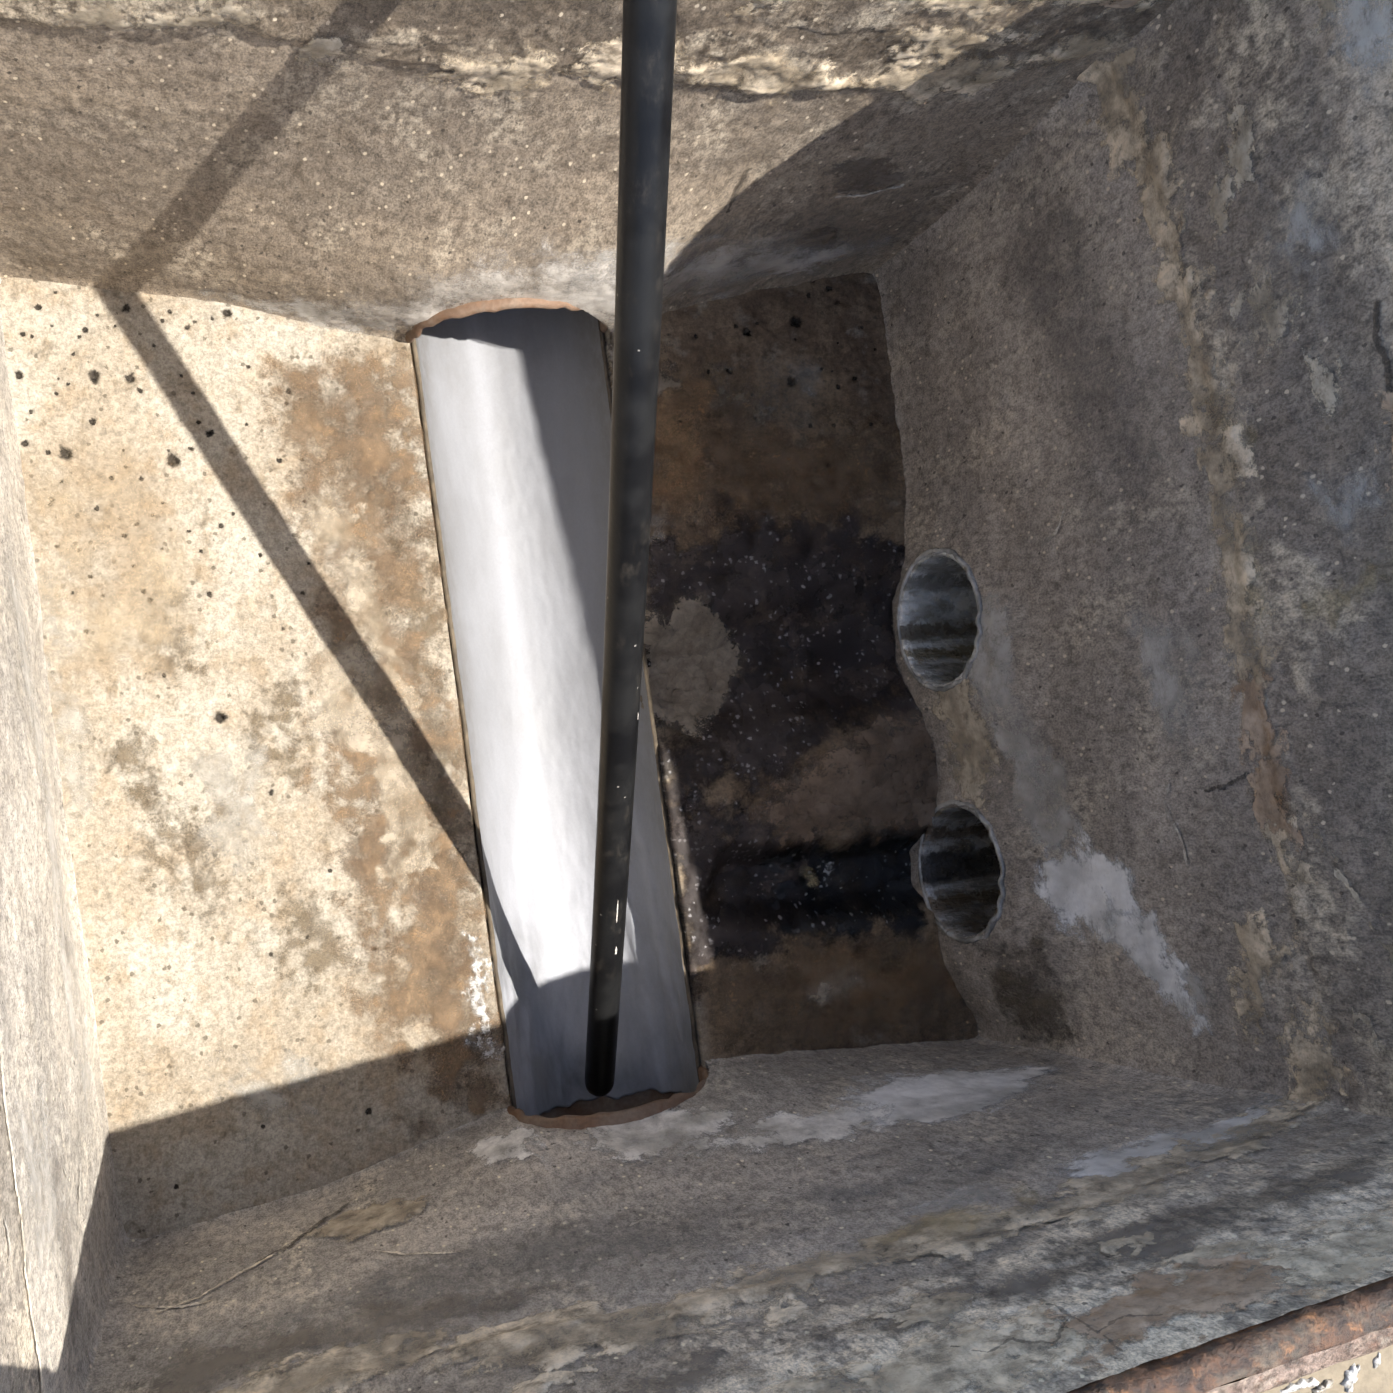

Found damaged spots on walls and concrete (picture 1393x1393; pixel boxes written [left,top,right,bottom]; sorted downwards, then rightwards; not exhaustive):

damp [931,607,1059,812]
damp [992,968,1073,1040]
damp [1033,807,1209,1036]
crack [0,1033,44,1393]